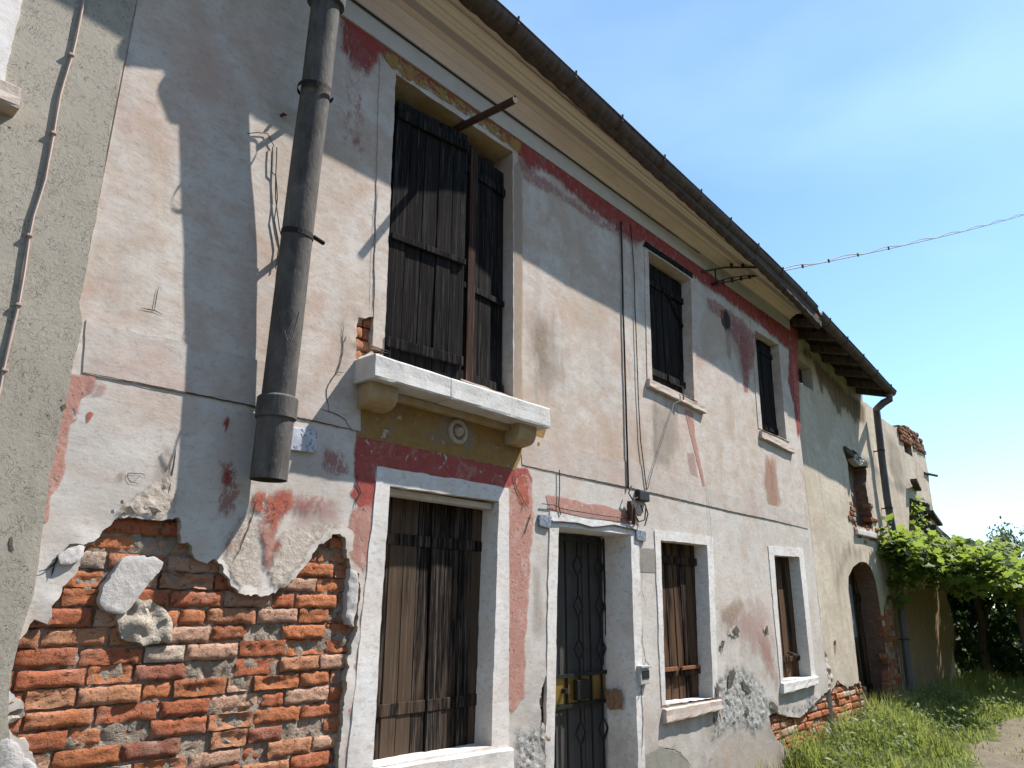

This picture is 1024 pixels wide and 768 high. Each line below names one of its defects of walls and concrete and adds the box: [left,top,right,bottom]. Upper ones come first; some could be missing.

peeling [341,17,801,435]
flaking render [893,425,927,455]
flaking render [848,493,879,544]
flaking render [0,403,534,768]
flaking render [713,651,871,753]